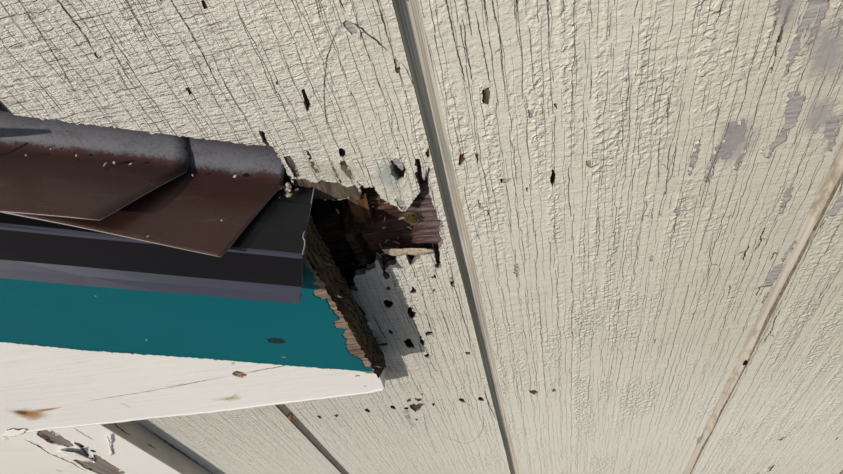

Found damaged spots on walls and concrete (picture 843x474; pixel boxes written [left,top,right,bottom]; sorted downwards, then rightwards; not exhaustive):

crack [57,0,140,96]
crack [171,1,218,86]
crack [315,0,390,128]
crack [445,0,506,96]
peeling [770,0,829,74]
peeling [284,151,362,201]
crack [658,100,677,184]
peeling [704,118,749,182]
peeling [759,91,805,158]
peeling [824,113,843,152]
crack [738,184,786,260]
peeling [37,430,125,474]